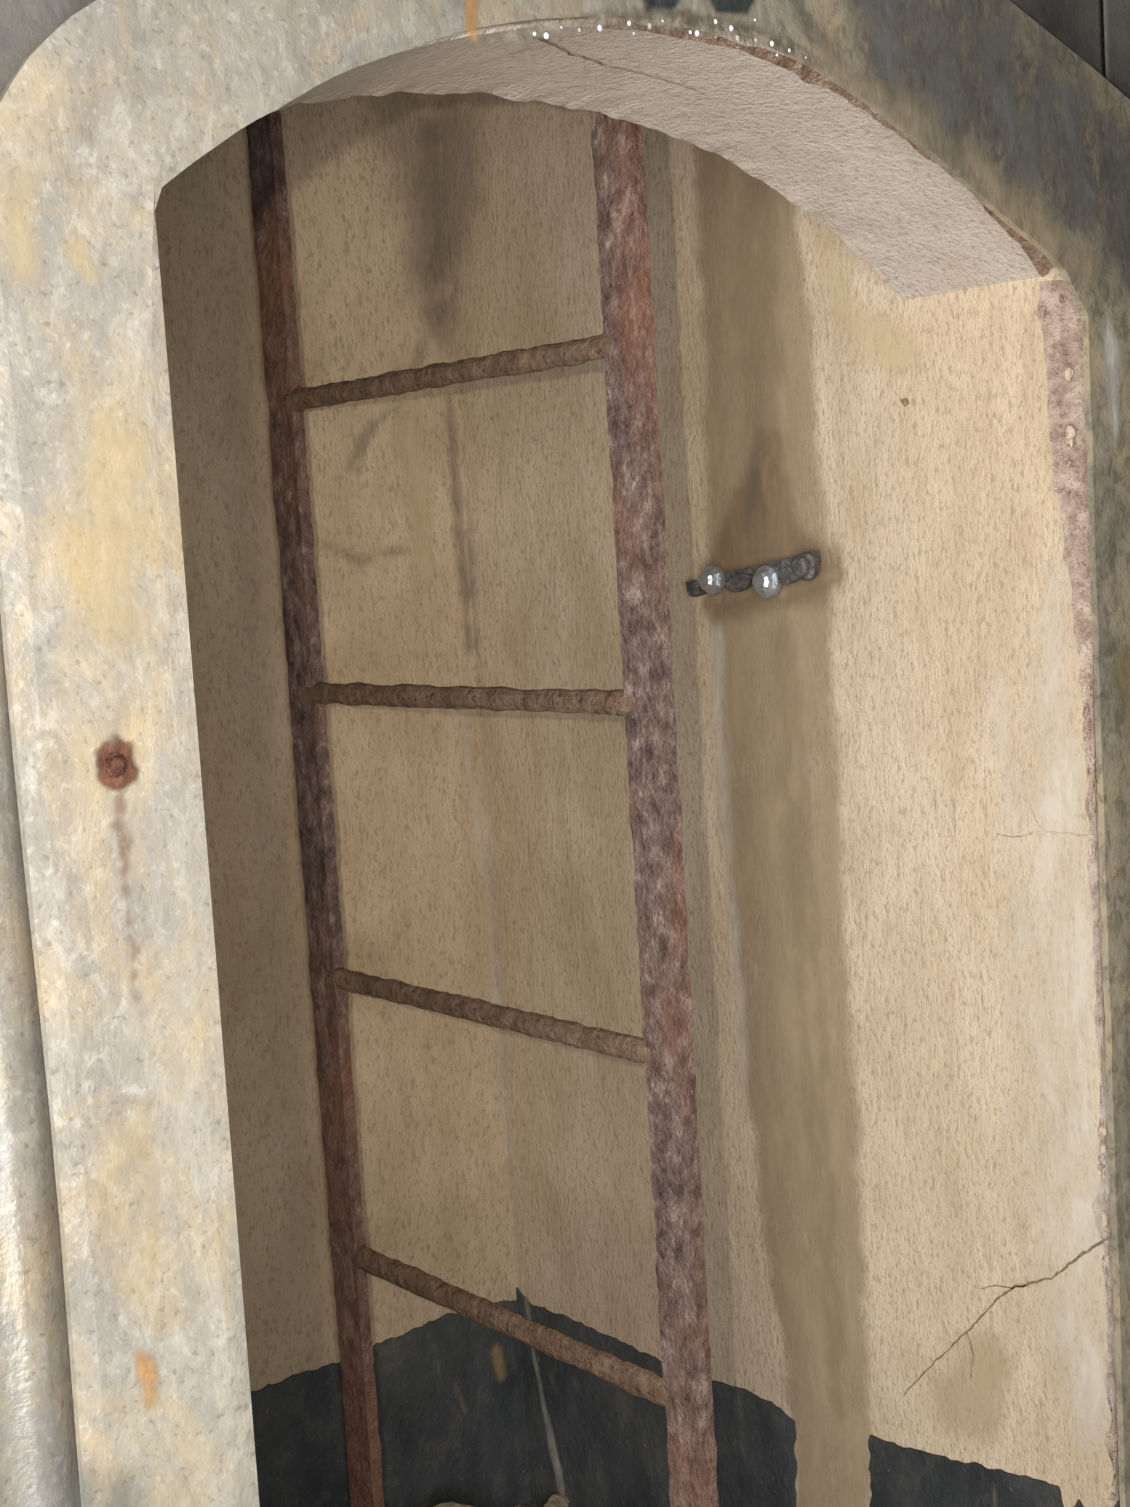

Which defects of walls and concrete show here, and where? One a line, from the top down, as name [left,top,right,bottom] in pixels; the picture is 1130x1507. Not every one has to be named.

rust [97,735,138,790]
water stain [698,147,870,1507]
peeling [492,1346,505,1380]
crack [903,1235,1112,1396]